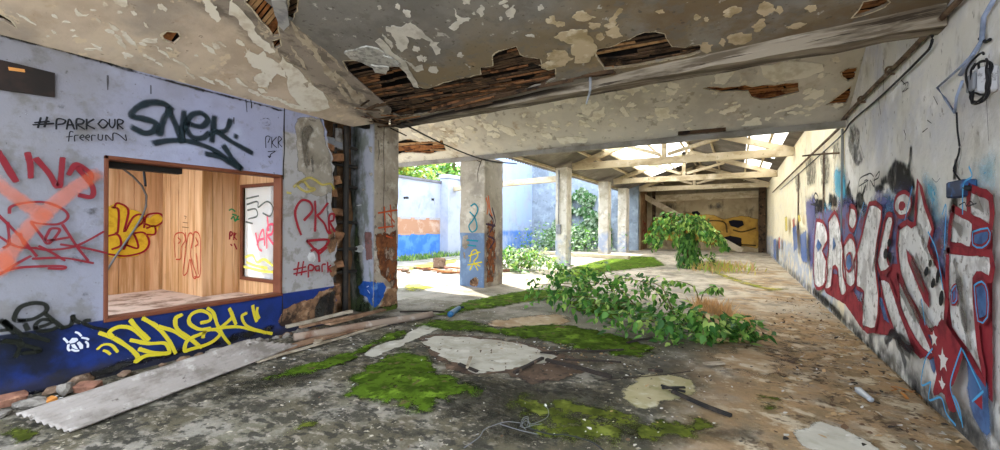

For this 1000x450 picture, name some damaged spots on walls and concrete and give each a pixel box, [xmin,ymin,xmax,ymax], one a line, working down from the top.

peeling [786,5,817,29]
flaking render [46,0,783,216]
peeling [703,56,857,126]
spalling [375,230,440,307]